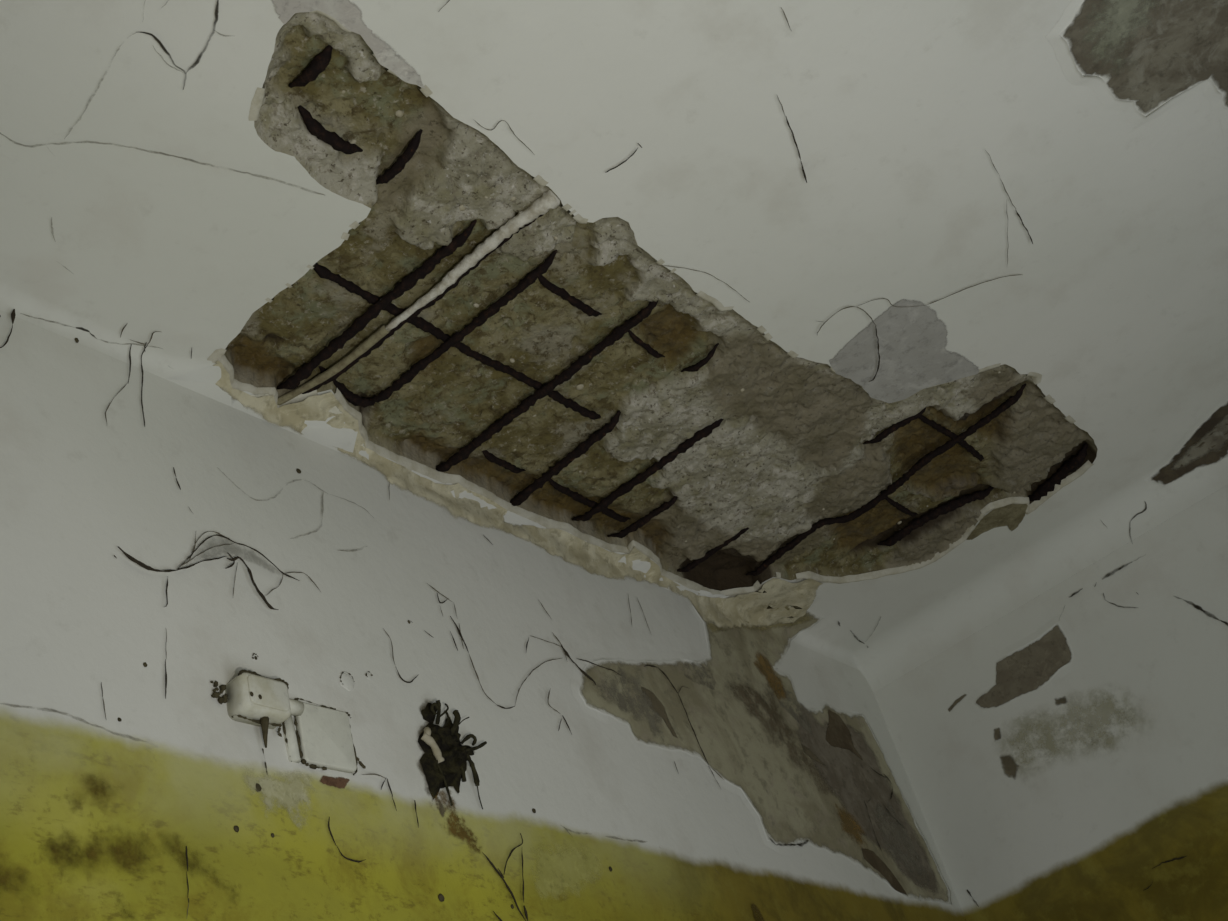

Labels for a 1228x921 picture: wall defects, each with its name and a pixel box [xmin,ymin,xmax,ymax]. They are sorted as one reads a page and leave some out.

crack [118,0,225,89]
peeling [1046,0,1228,135]
spalling [207,0,1098,913]
crack [1186,601,1228,625]